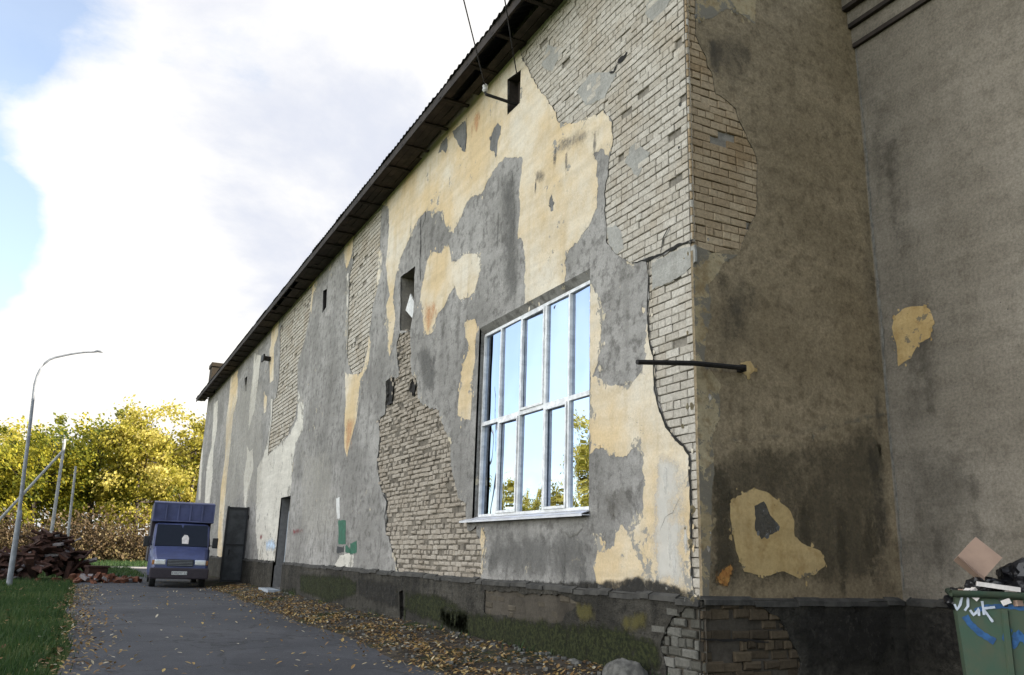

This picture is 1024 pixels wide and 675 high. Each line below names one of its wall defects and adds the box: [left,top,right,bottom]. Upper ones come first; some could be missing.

peeling [198,277,318,562]
spalling [343,0,801,675]
crack [632,225,693,576]
peeling [729,487,827,587]
water stain [714,431,884,583]
peeling [892,305,935,366]